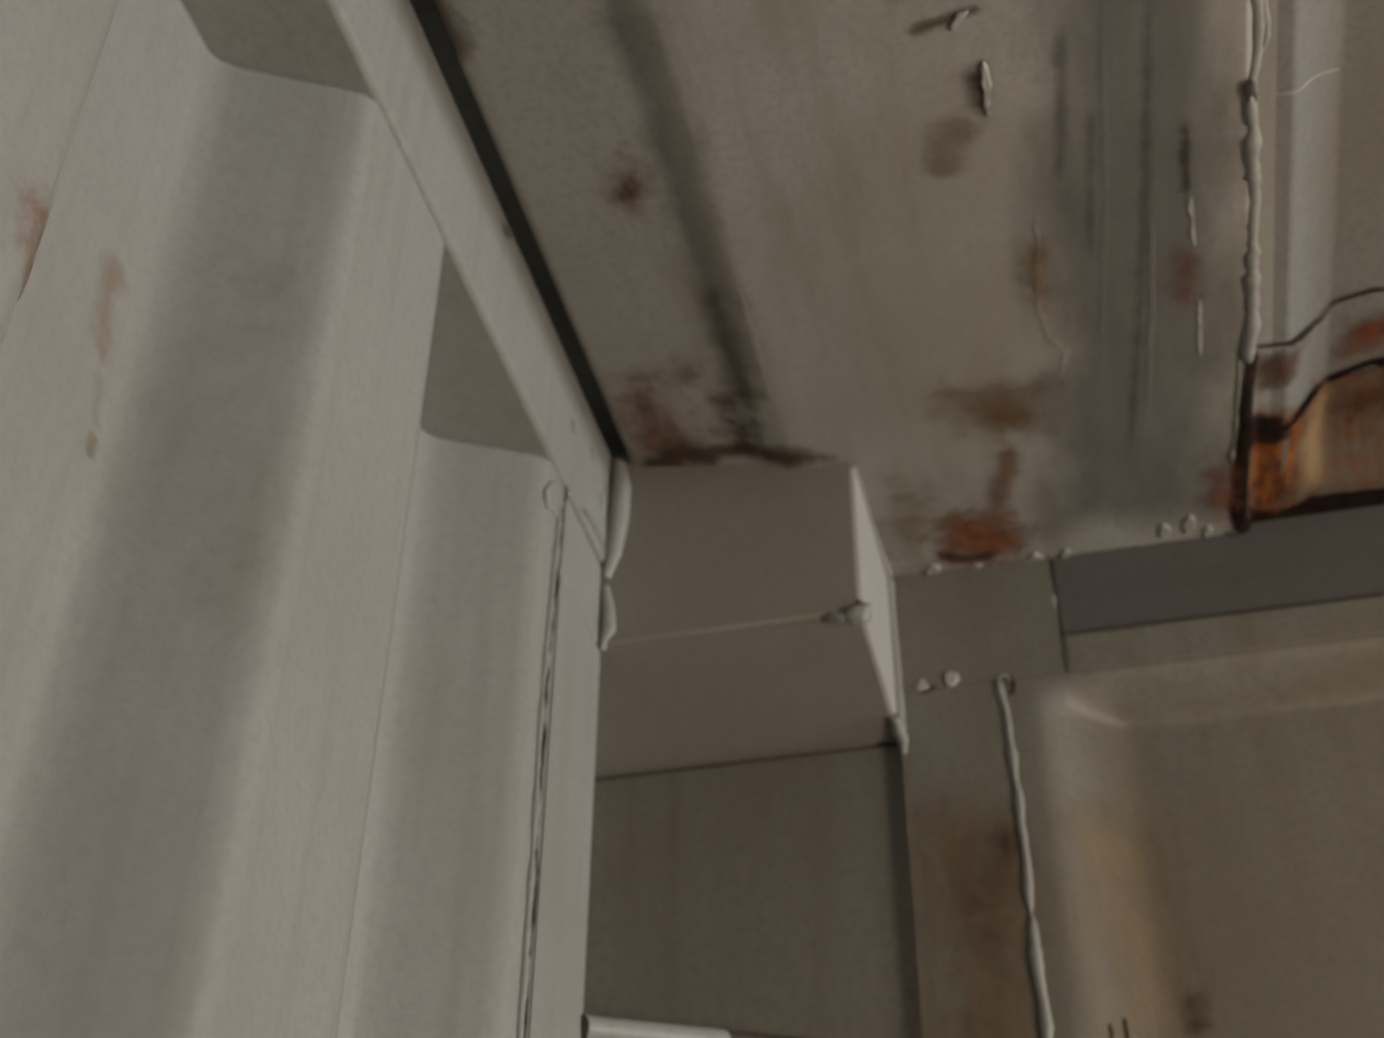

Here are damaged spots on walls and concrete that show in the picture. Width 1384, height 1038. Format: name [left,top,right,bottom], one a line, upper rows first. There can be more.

rust [638,404,824,467]
rust [1228,351,1384,536]
rust [940,451,1020,563]